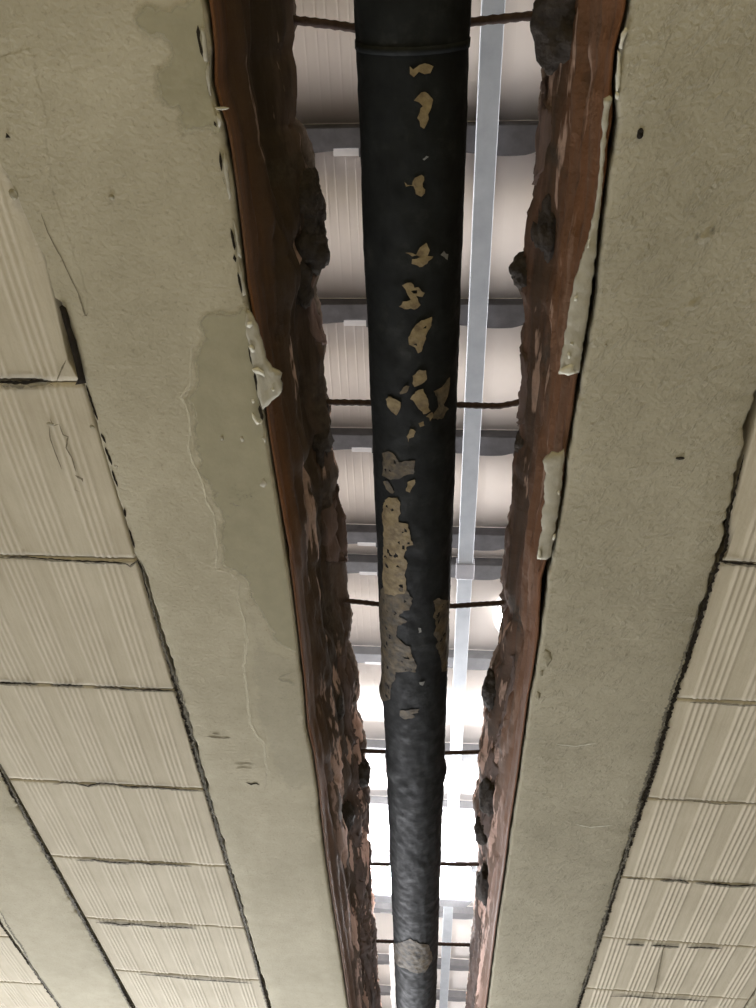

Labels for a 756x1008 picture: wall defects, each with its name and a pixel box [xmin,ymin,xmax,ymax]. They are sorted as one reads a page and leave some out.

damp [136,0,220,133]
peeling [245,309,283,425]
peeling [558,27,628,376]
damp [180,306,296,788]